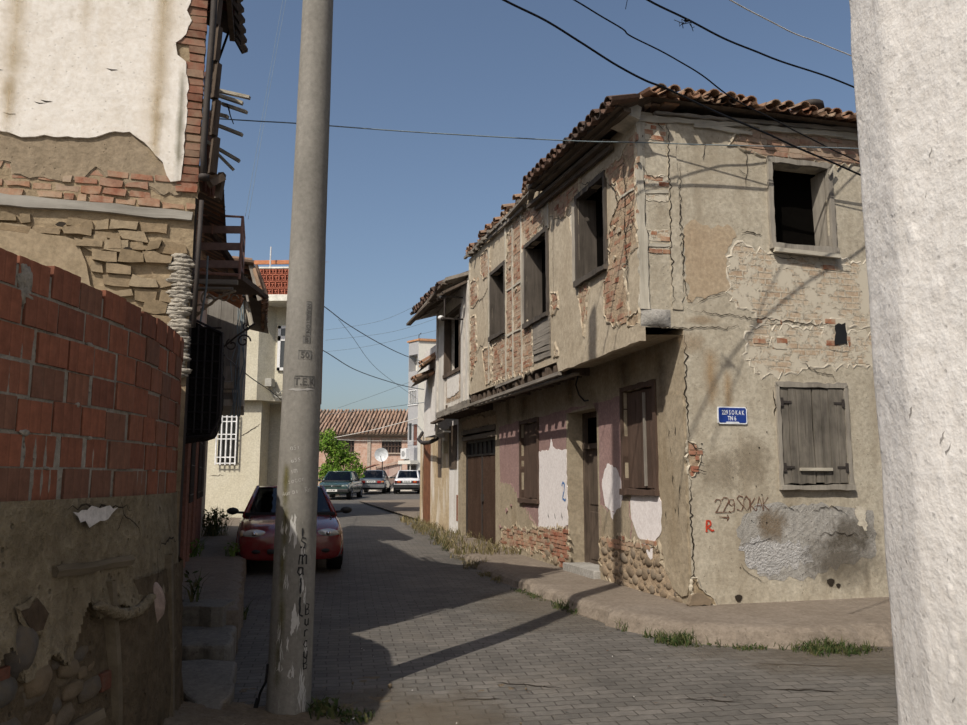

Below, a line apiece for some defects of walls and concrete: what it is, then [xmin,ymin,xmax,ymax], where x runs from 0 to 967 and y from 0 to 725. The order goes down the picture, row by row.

spalling [55,167,183,197]
flaking render [602,122,670,329]
flaking render [726,128,860,171]
flaking render [446,176,582,404]
flaking render [577,281,590,337]
flaking render [725,240,873,381]
crack [603,123,829,593]
flaking render [499,481,572,568]
flaking render [16,595,50,635]